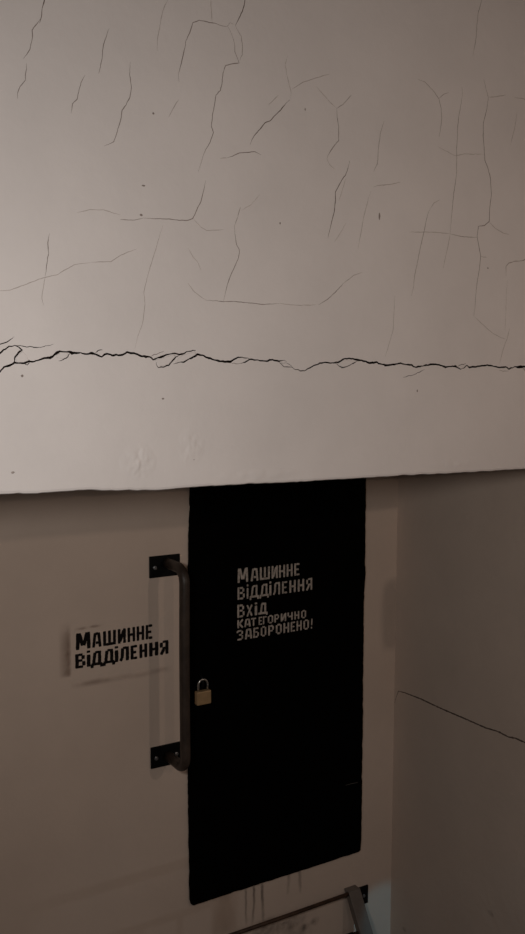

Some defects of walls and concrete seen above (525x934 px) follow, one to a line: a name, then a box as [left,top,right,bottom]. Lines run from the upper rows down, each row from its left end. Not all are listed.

crack [0,0,525,377]
crack [395,691,525,743]